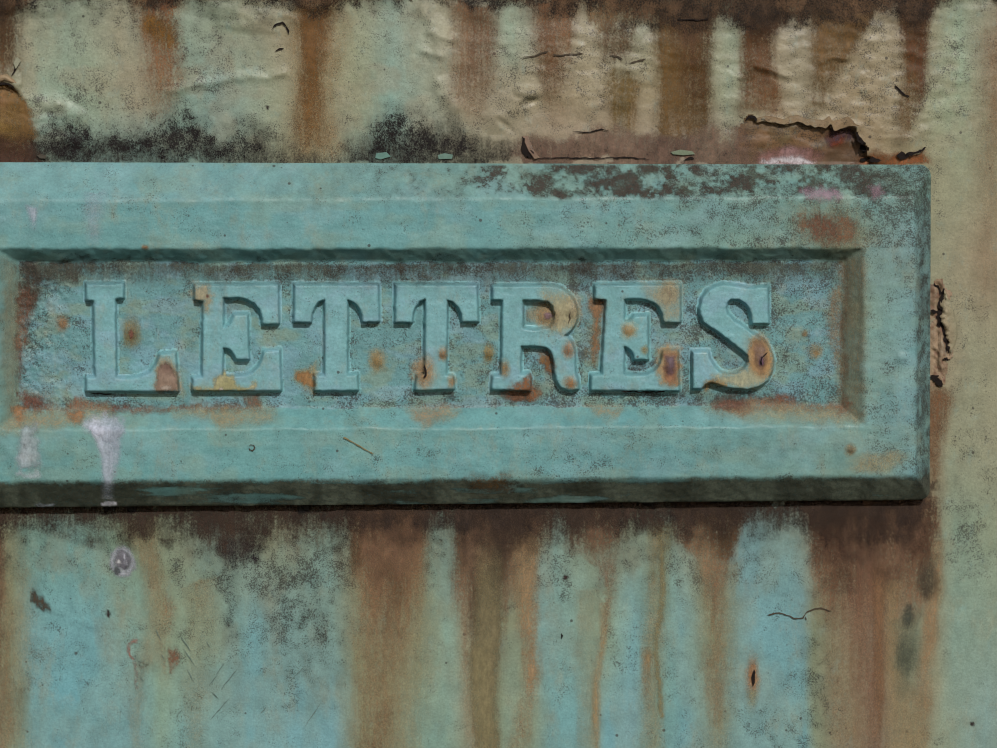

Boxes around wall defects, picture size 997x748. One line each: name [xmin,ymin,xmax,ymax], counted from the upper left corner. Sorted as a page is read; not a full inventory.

corrosion [0,0,45,162]
corrosion [300,0,334,146]
damp [22,103,316,163]
peeling [738,114,928,165]
corrosion [539,343,573,374]
corrosion [536,294,577,332]
corrosion [589,298,604,352]
peeling [930,279,958,387]
corrosion [501,376,542,402]
corrosion [674,502,742,673]